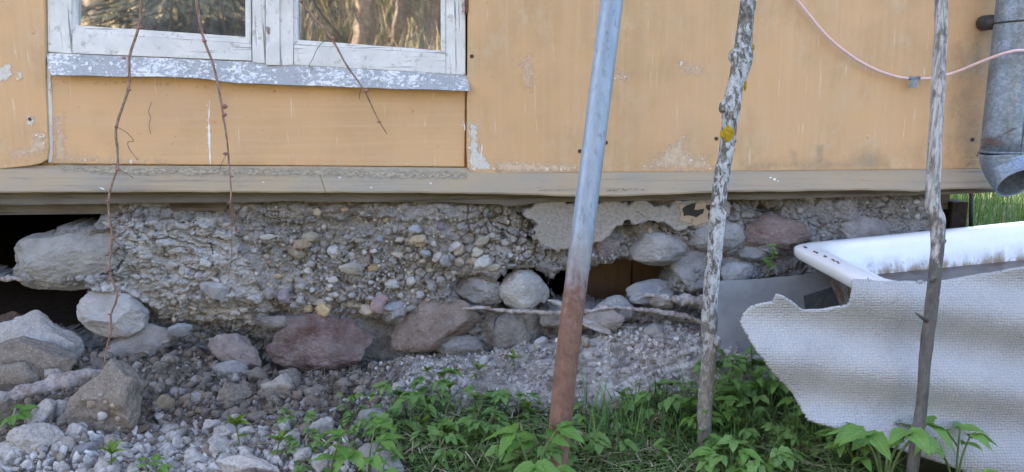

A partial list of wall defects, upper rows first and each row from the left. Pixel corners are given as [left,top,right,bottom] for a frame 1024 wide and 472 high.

peeling [0,64,22,81]
peeling [298,69,426,82]
peeling [461,124,576,172]
peeling [642,136,712,170]
peeling [679,203,711,226]